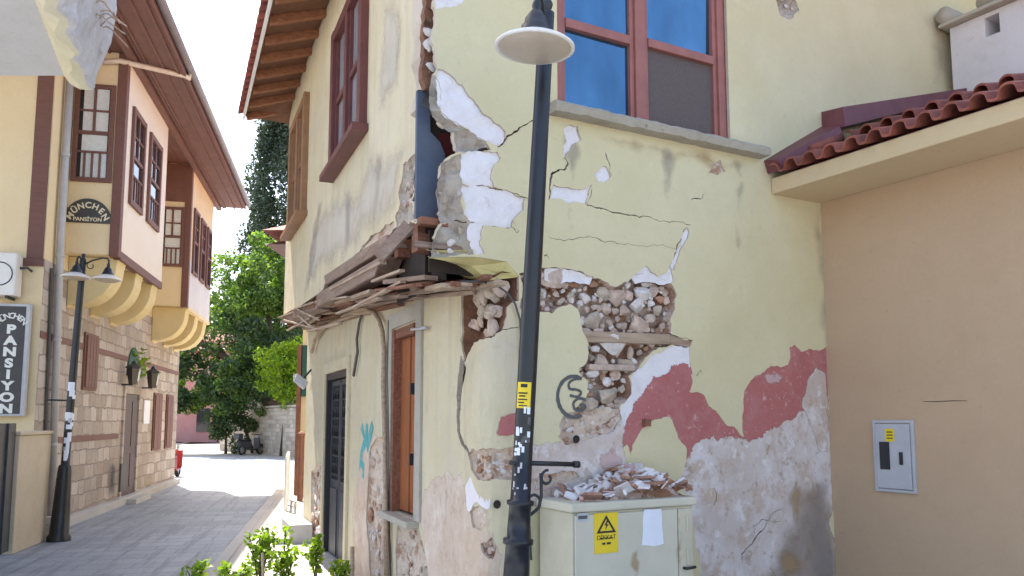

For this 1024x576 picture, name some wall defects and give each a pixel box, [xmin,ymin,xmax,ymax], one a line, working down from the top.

spalling [776,0,798,20]
spalling [429,70,524,258]
peeling [563,125,580,159]
peeling [550,166,609,204]
spalling [463,271,524,358]
peeling [531,228,835,576]
spalling [352,435,384,576]
peeling [397,413,515,576]